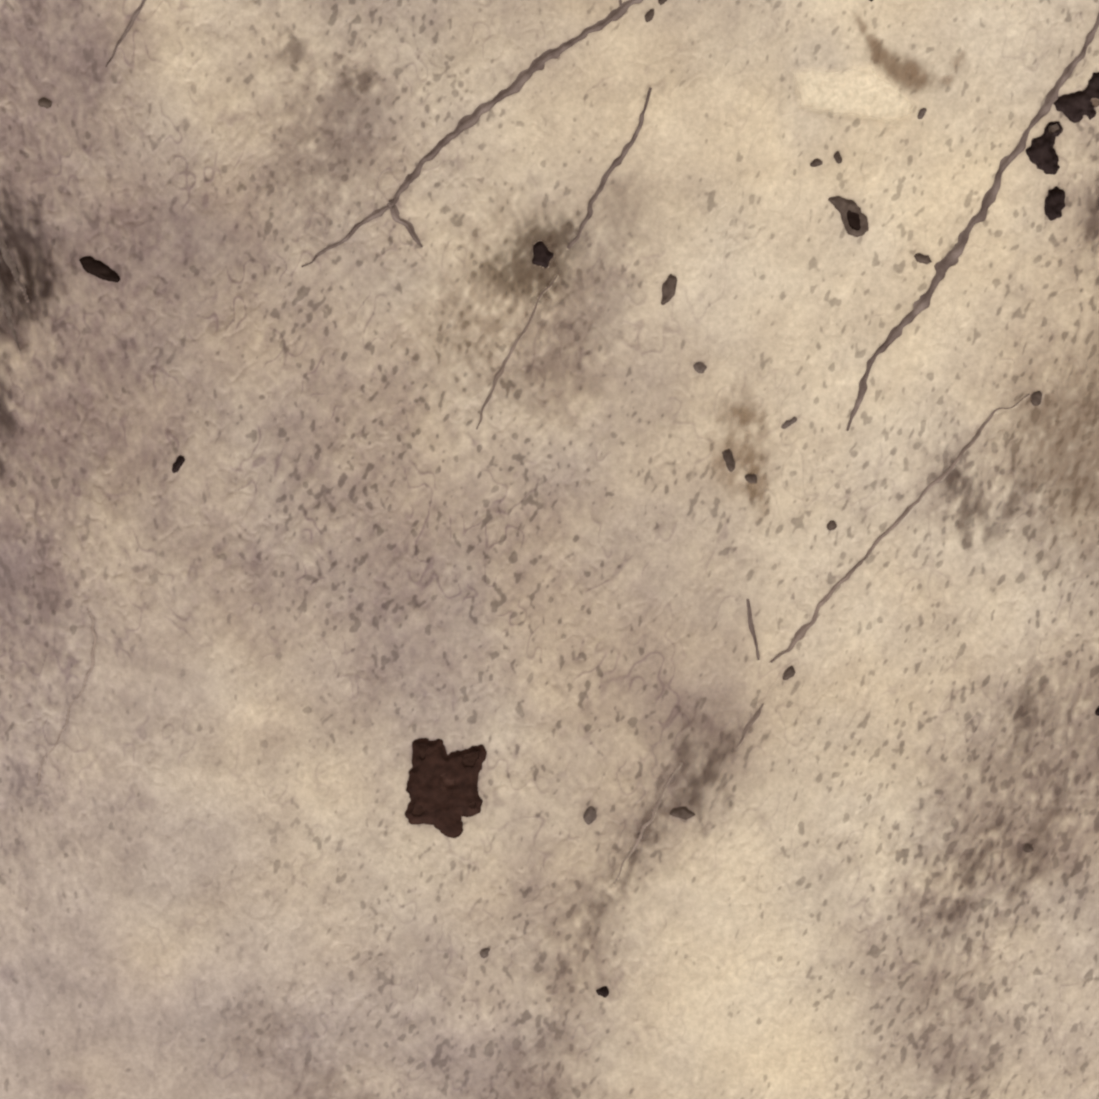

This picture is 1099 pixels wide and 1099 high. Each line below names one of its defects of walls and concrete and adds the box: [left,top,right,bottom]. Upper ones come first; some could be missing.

crack [301,0,652,267]
peeling [828,196,869,237]
crack [846,14,1099,431]
spalling [1026,72,1099,220]
crack [476,275,558,429]
crack [746,394,1030,663]
spalling [405,738,487,838]
crack [735,704,764,749]